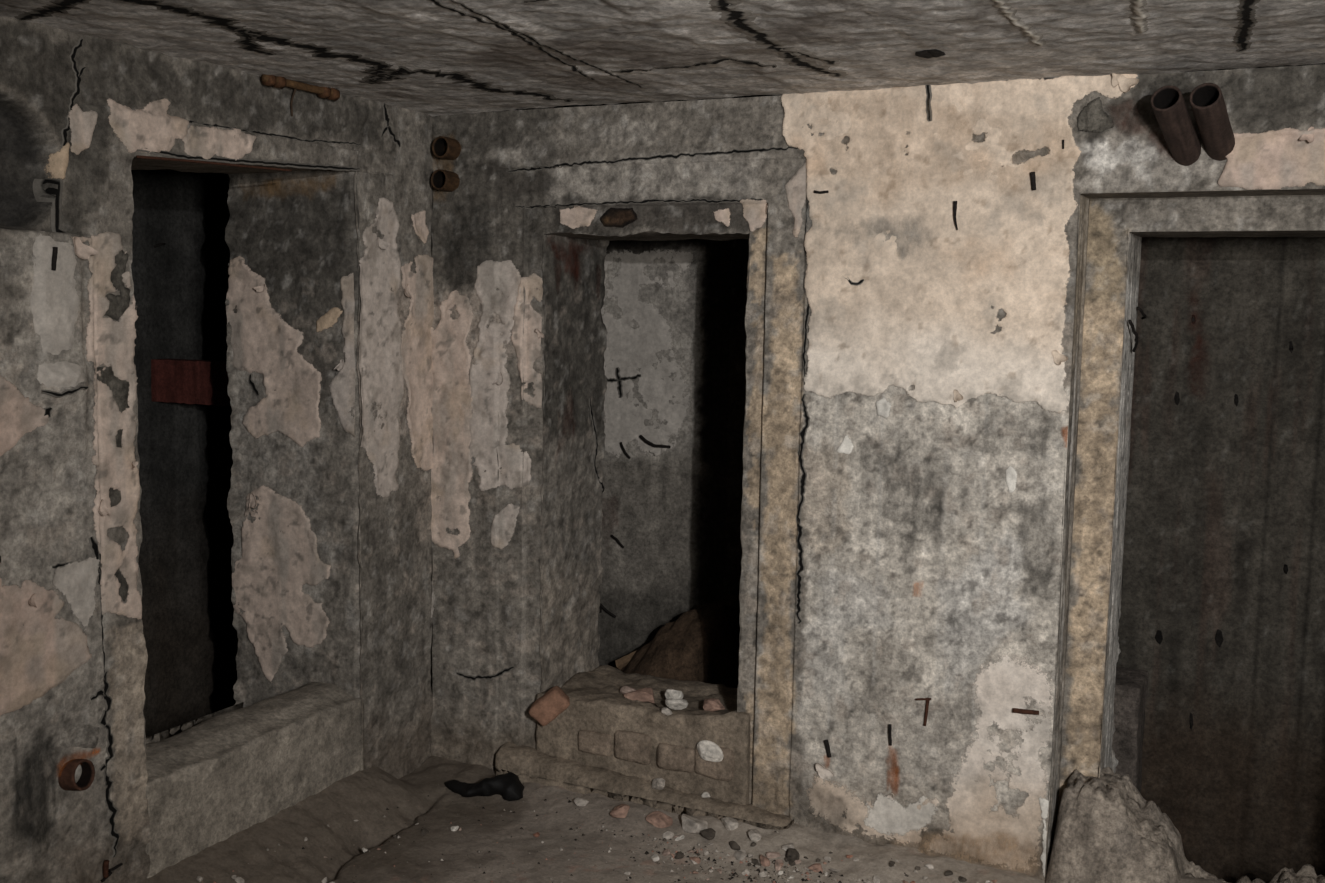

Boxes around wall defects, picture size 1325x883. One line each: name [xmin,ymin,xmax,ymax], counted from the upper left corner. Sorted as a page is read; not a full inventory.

flaking render [44,98,256,180]
crack [14,0,848,276]
crack [924,85,932,122]
crack [1128,0,1151,34]
crack [1231,0,1261,52]
flaking render [1218,127,1325,190]
flaking render [0,232,142,716]
flaking render [226,198,544,559]
crack [795,199,810,624]
crack [844,277,864,286]
flaking render [232,485,331,683]
crack [52,536,120,858]